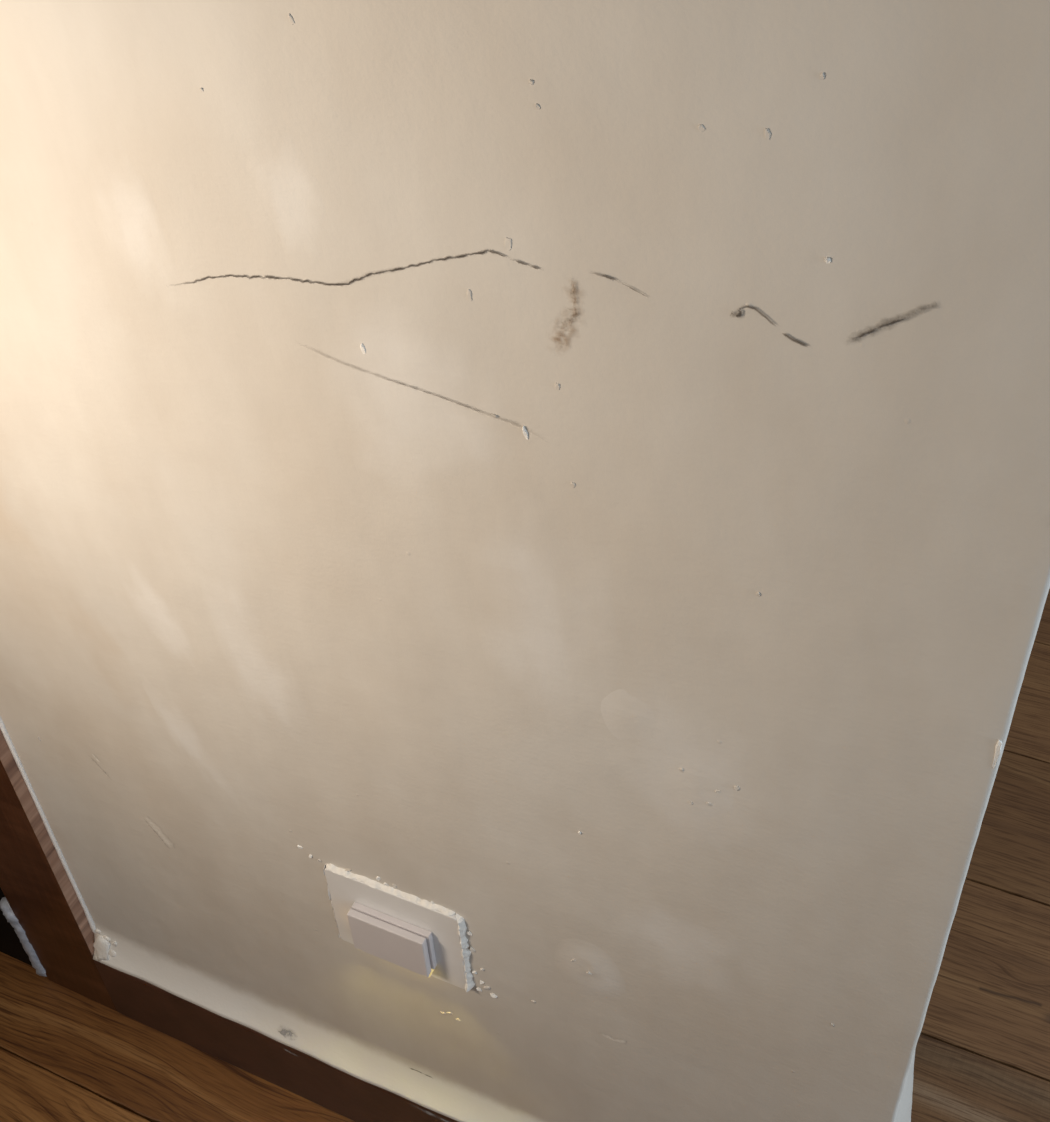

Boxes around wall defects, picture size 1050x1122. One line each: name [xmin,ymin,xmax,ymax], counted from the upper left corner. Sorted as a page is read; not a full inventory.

crack [193,250,538,286]
crack [731,306,806,346]
crack [859,308,924,337]
peeling [297,845,497,998]